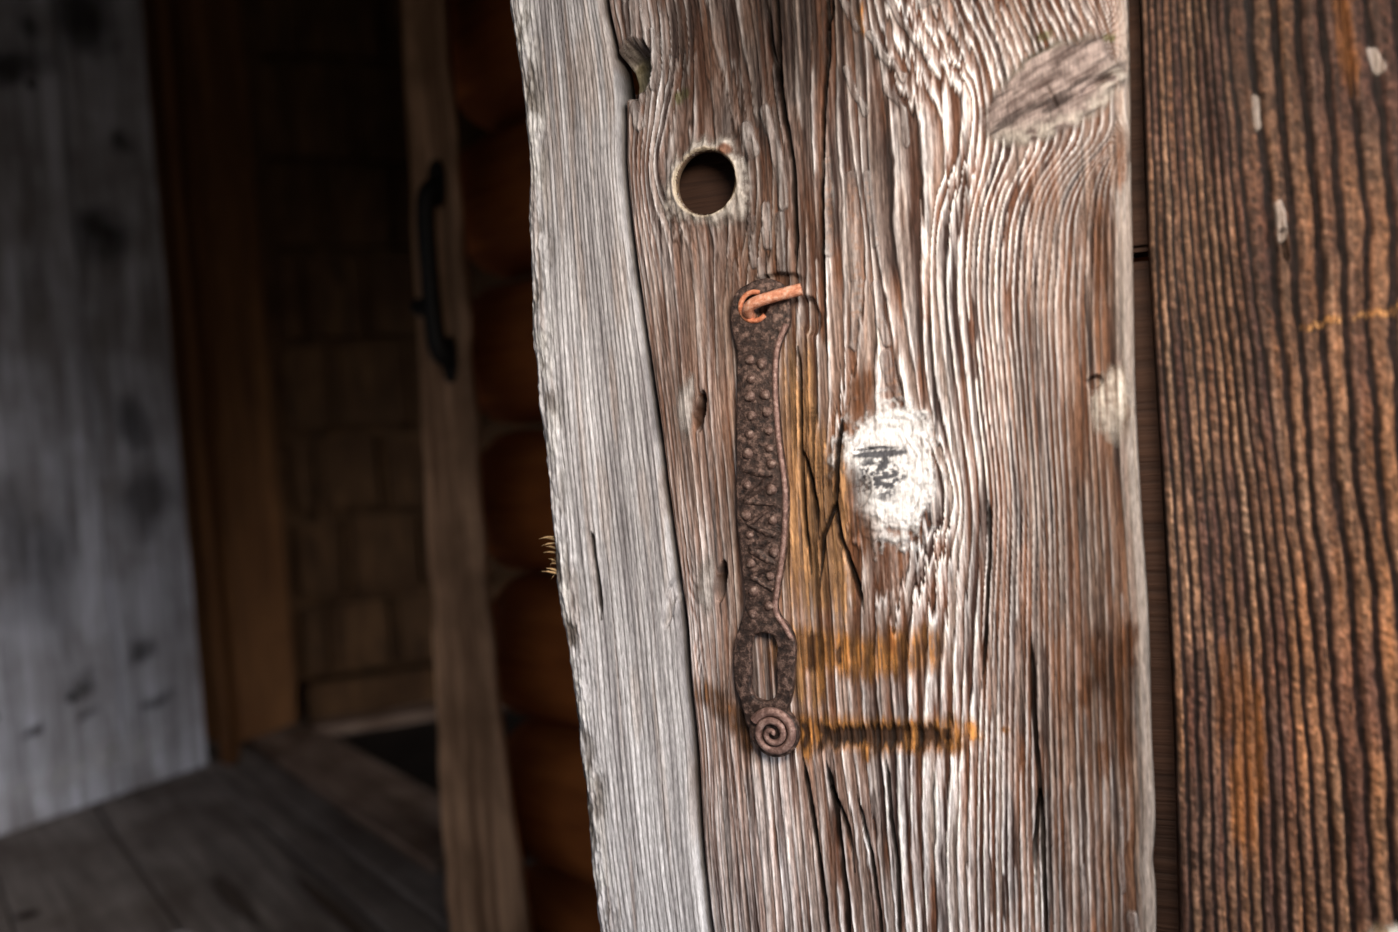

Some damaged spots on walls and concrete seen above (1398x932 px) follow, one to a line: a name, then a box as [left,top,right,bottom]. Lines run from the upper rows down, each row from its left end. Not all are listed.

crack [767,0,865,613]
corrosion [786,351,978,763]